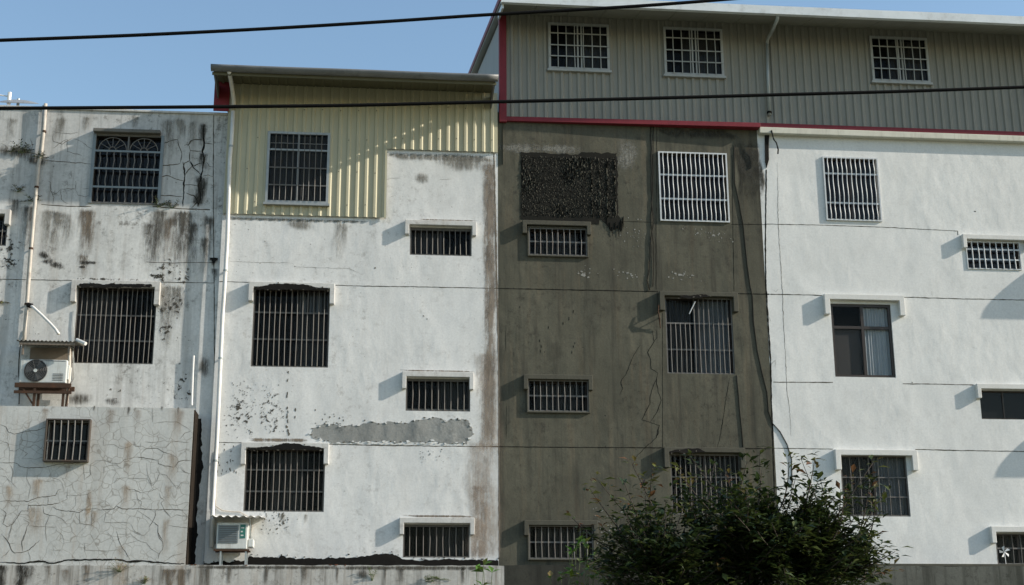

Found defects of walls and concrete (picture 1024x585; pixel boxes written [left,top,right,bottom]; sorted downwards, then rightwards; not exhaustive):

crack [3,276,71,284]
leakage [45,211,94,243]
crack [0,410,191,564]
leakage [147,177,216,340]
crack [151,115,315,365]
spalling [217,371,473,474]
leakage [392,153,496,438]
crack [330,153,663,557]
crack [624,131,657,222]